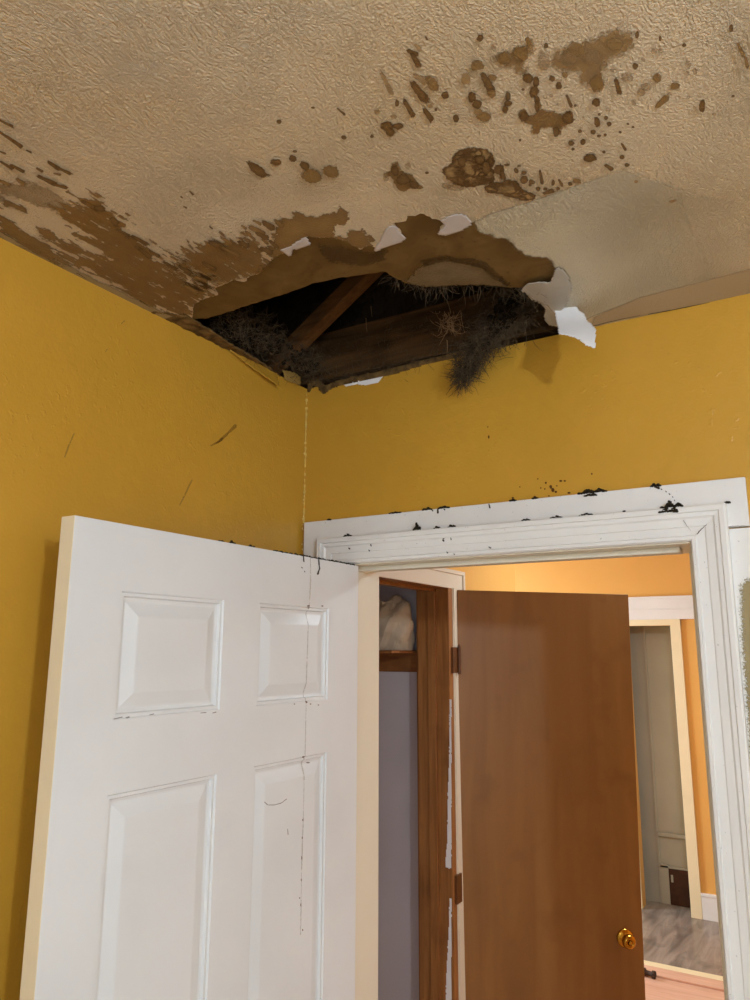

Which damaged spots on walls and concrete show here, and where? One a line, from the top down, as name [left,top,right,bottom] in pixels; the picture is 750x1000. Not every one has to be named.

leakage [370,36,449,138]
leakage [461,27,639,171]
leakage [631,61,697,108]
leakage [384,162,429,192]
leakage [442,147,581,201]
spalling [151,214,596,530]